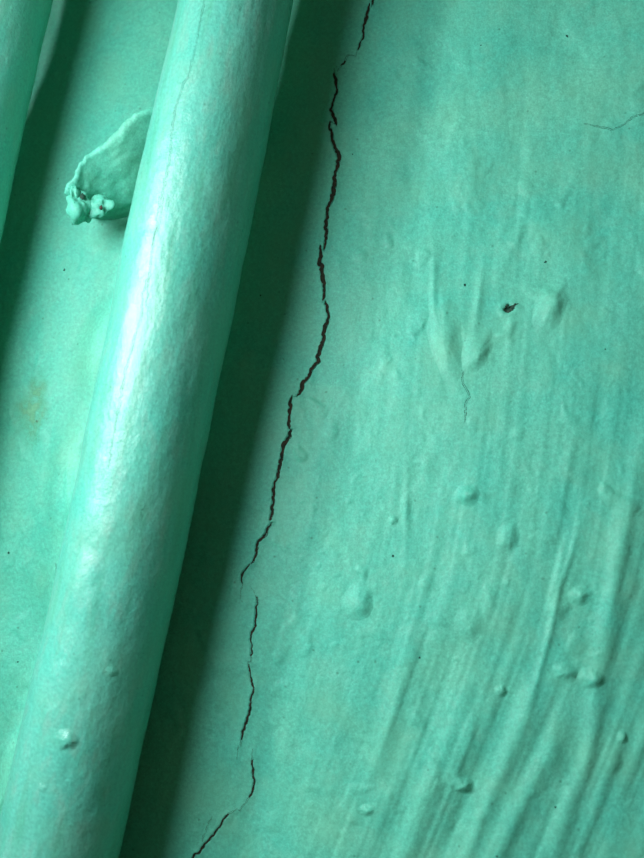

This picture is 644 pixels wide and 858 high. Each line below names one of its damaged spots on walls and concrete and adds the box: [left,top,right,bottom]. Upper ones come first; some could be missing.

crack [108,0,205,468]
crack [192,0,374,858]